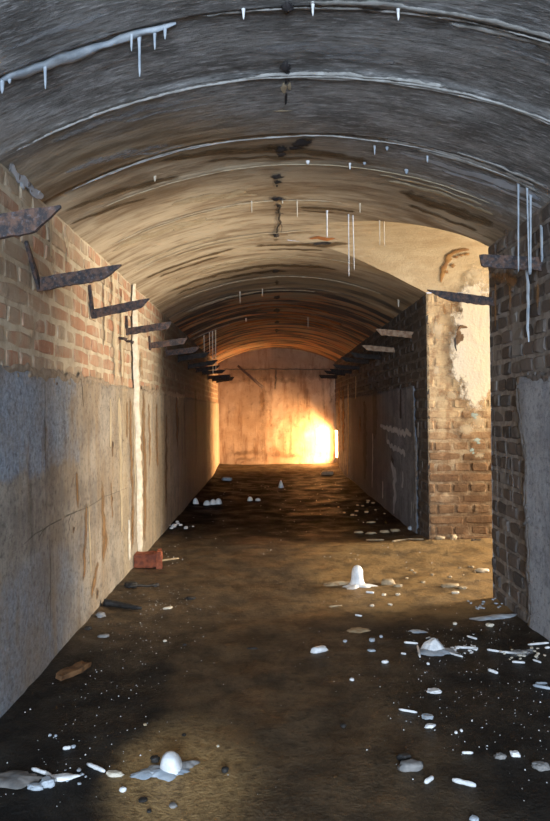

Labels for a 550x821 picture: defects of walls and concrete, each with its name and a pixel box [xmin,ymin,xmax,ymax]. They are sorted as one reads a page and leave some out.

efflorescence [1,22,176,82]
crack [275,204,283,234]
damp [65,135,544,264]
peeling [448,270,490,434]
damp [104,275,143,560]